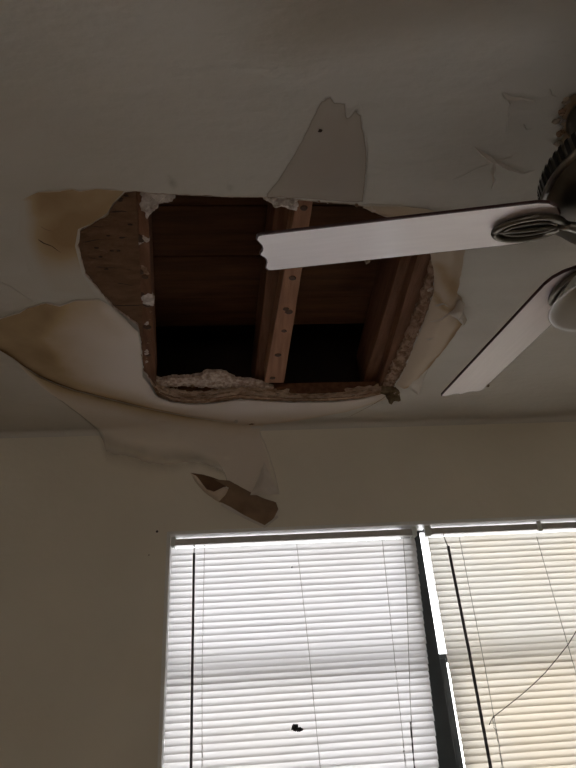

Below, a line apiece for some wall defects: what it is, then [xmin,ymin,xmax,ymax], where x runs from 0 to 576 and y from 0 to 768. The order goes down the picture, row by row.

peeling [267,98,437,217]
water stain [18,189,124,300]
spalling [78,191,148,371]
peeling [383,250,467,395]